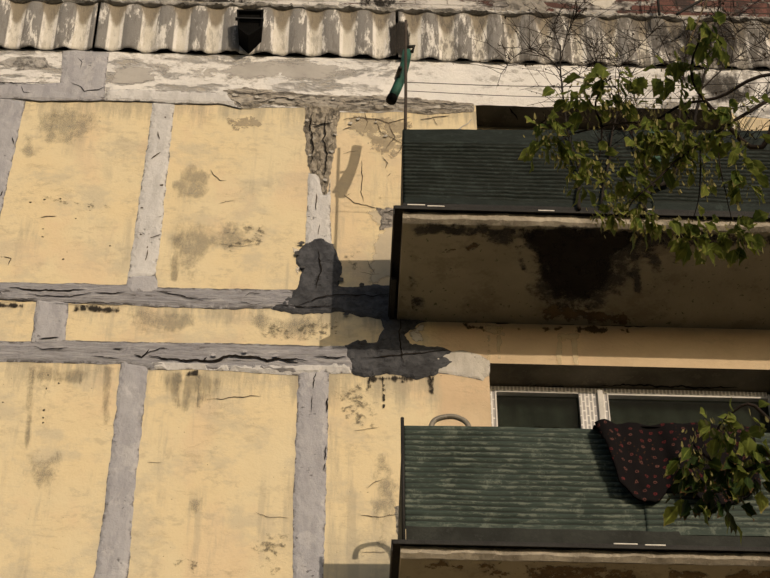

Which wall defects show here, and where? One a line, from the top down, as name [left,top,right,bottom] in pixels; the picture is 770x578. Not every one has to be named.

peeling [589,0,616,9]
spalling [0,56,49,71]
peeling [110,64,169,84]
spalling [191,59,474,195]
crack [343,115,472,176]
crack [344,150,375,208]
crack [0,287,129,304]
damp [481,226,689,365]